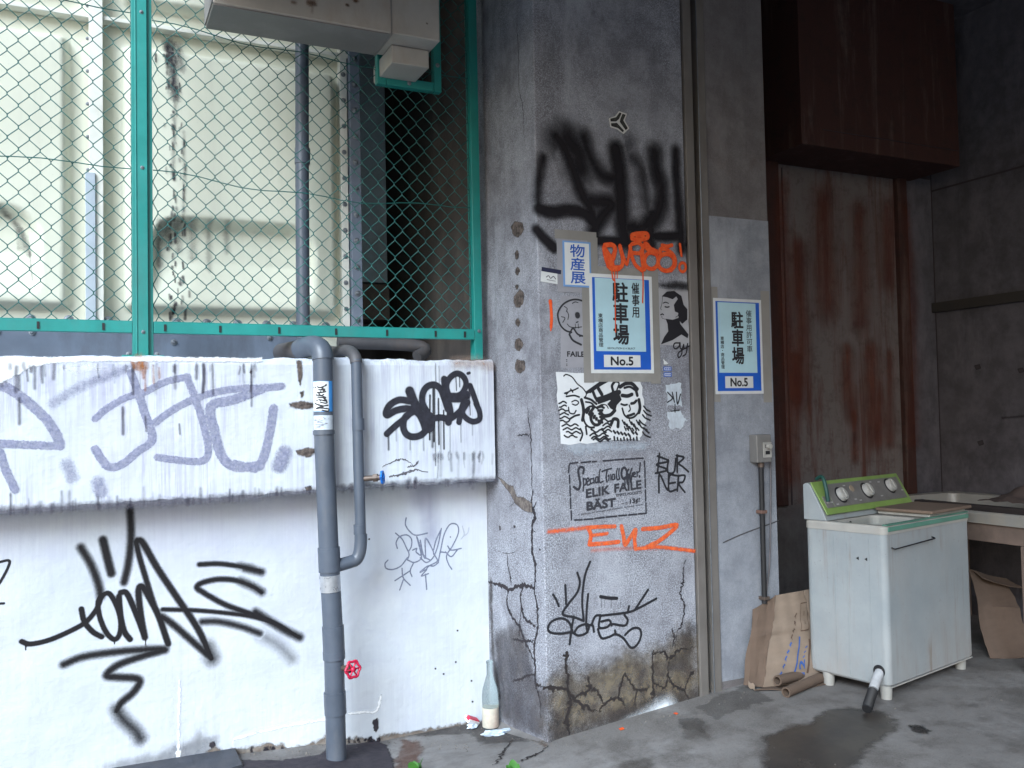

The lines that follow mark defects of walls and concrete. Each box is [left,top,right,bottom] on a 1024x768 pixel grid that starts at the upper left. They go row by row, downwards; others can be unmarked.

leakage [155,40,181,97]
leakage [167,164,190,320]
leakage [0,490,315,513]
leakage [420,580,700,743]
crack [488,408,695,765]